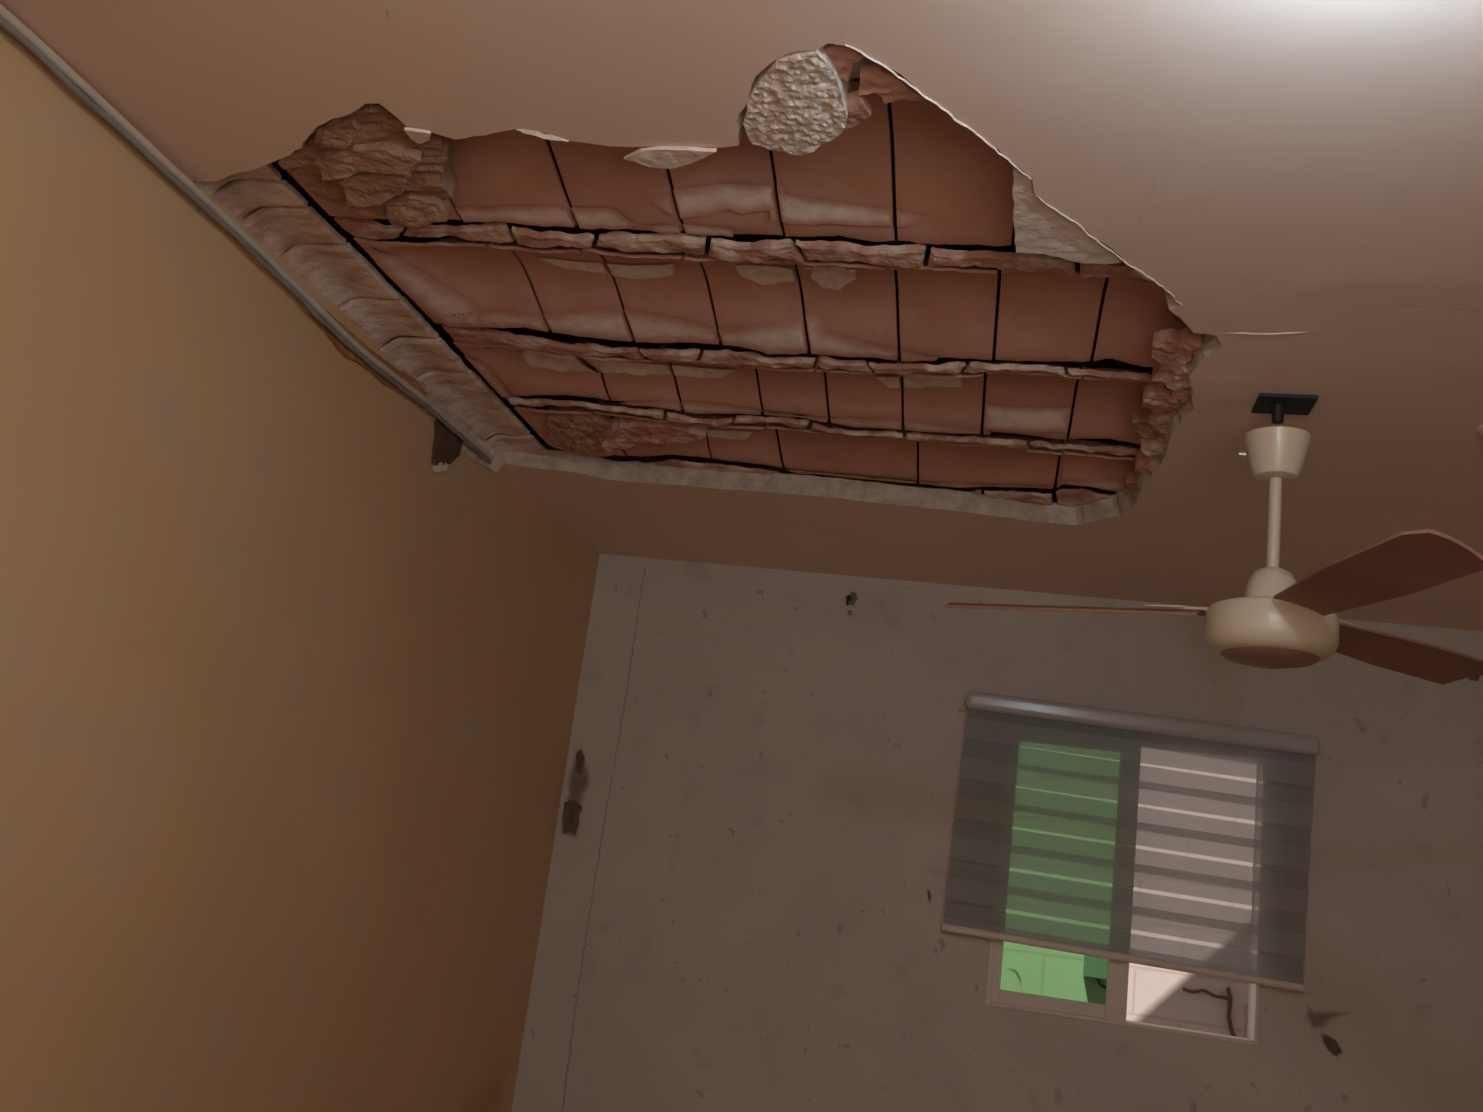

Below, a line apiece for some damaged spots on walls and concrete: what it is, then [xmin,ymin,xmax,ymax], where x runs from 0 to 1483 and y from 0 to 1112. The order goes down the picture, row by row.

spalling [196,43,1221,525]
peeling [557,741,593,844]